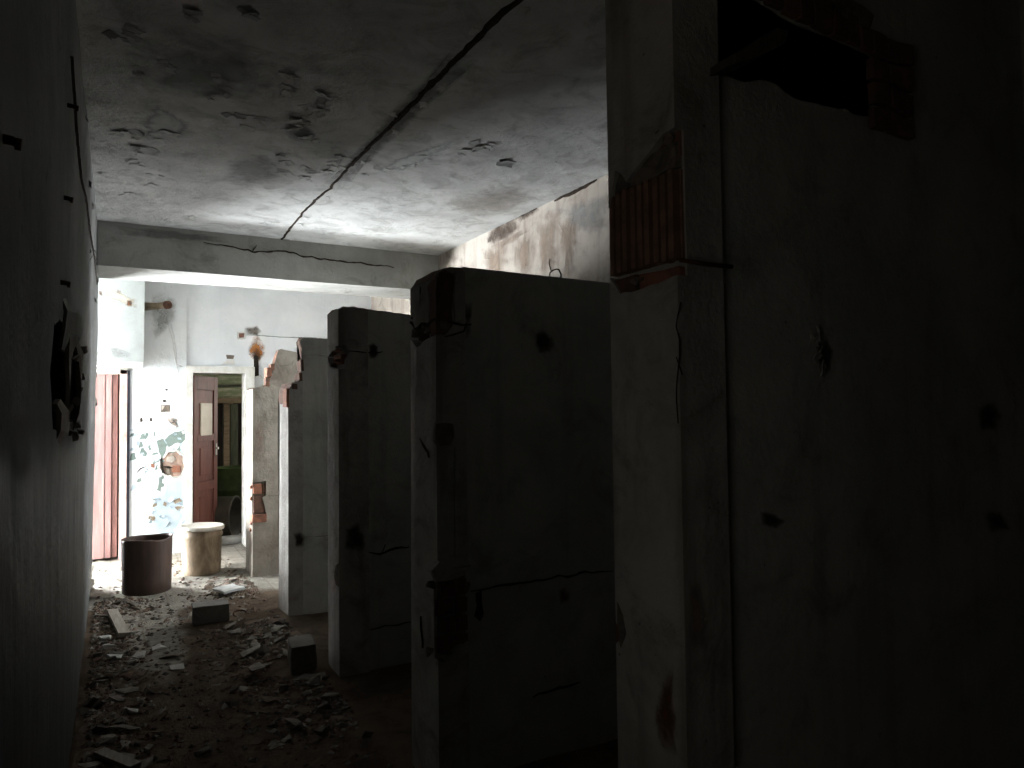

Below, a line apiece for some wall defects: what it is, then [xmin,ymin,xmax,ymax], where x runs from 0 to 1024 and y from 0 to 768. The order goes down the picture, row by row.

crack [204,0,531,268]
water stain [488,201,598,271]
spalling [609,130,685,293]
spalling [52,298,98,446]
flaking render [264,364,275,386]
flaking render [282,360,304,407]
peeling [130,417,185,536]
spalling [249,483,267,532]